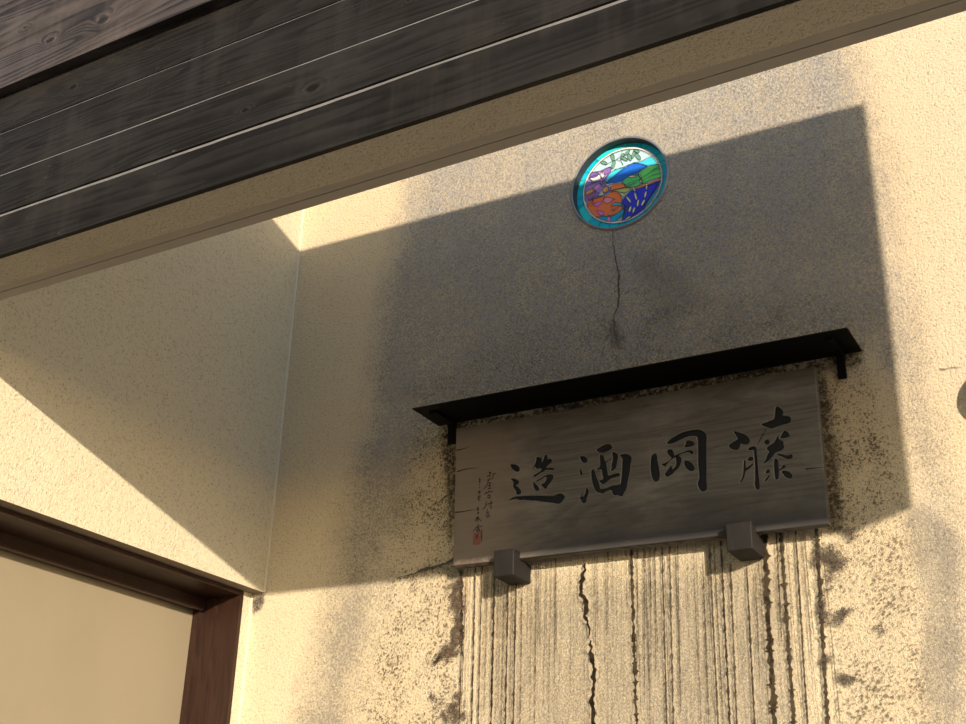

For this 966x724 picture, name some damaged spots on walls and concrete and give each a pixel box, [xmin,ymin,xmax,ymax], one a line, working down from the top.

crack [612,241,620,348]
damp [298,47,966,724]
crack [400,558,453,577]
crack [578,563,599,724]